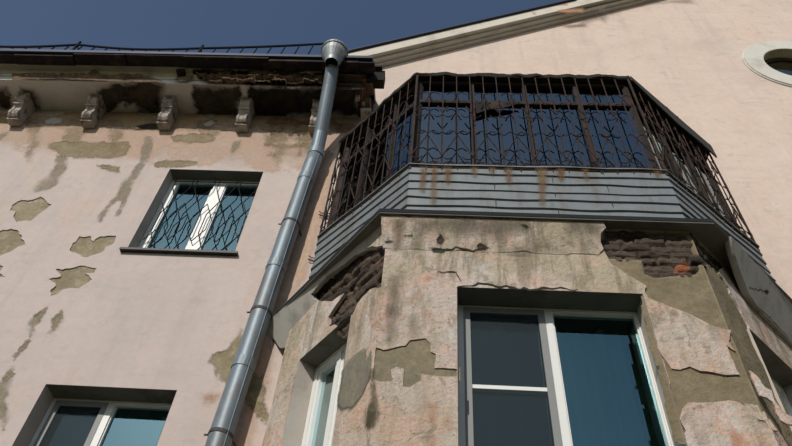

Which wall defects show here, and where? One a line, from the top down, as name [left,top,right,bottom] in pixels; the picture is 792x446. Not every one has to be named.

water stain [0,82,322,171]
peeling [0,141,131,256]
peeling [99,123,197,222]
water stain [272,85,360,317]
peeling [50,236,116,295]
flaking render [316,240,392,339]
crack [428,246,577,291]
water stain [236,406,255,446]
spalling [246,373,269,424]
water stain [256,331,272,379]
flaking render [337,339,460,410]
flaking render [601,230,792,446]